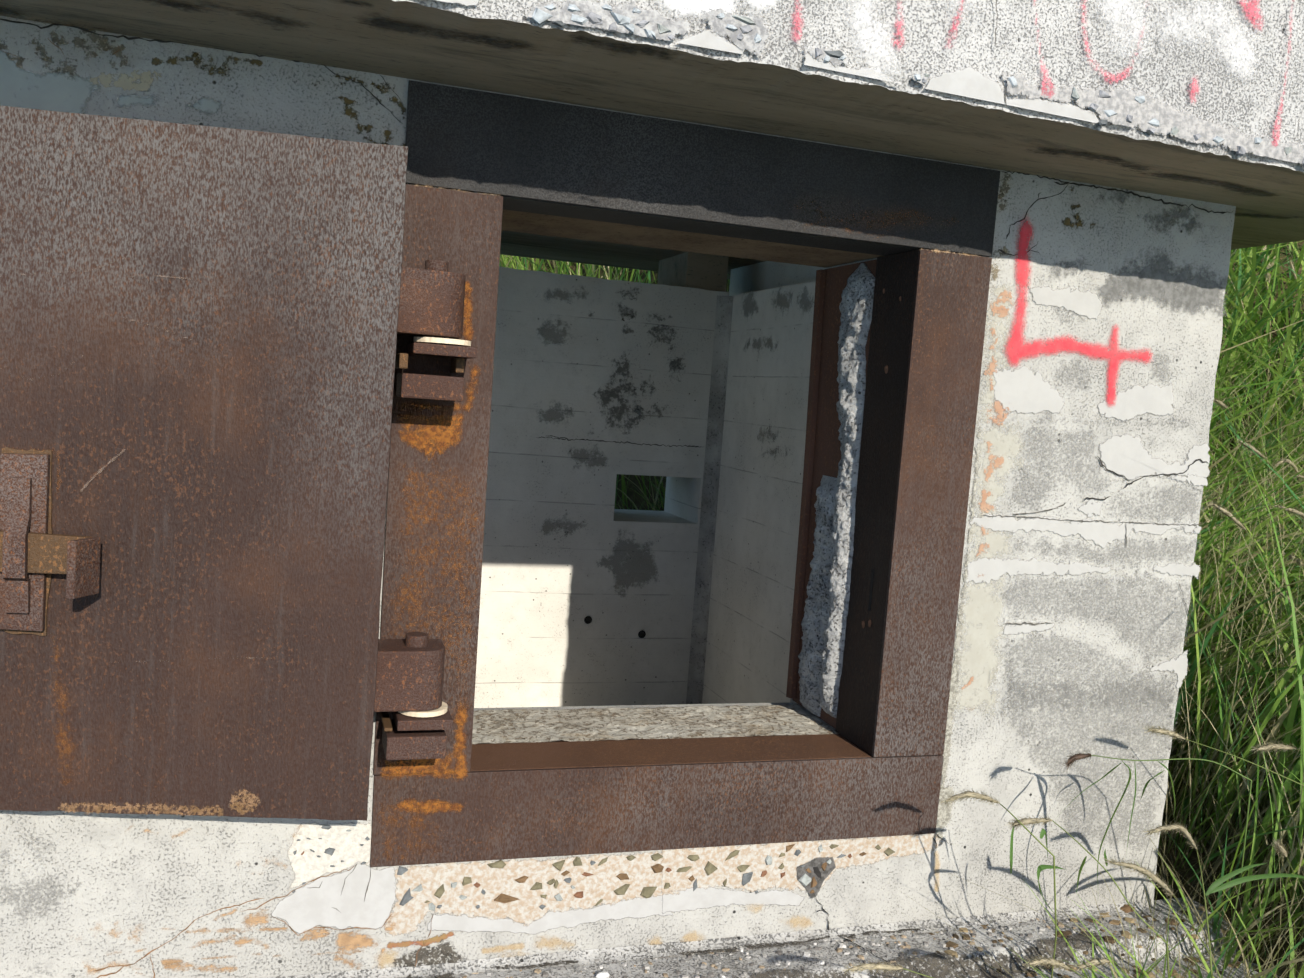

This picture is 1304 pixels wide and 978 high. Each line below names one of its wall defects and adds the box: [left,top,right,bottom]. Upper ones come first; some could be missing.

spalling [527,0,769,56]
damp [338,82,406,146]
damp [1098,254,1225,315]
corrosion [400,367,478,456]
damp [594,359,664,434]
spalling [798,263,875,718]
spalling [385,424,1024,936]
corrosion [382,707,468,779]
corrosion [61,789,259,832]
corrosion [397,799,463,813]
spalling [287,822,372,893]
crack [92,864,393,978]